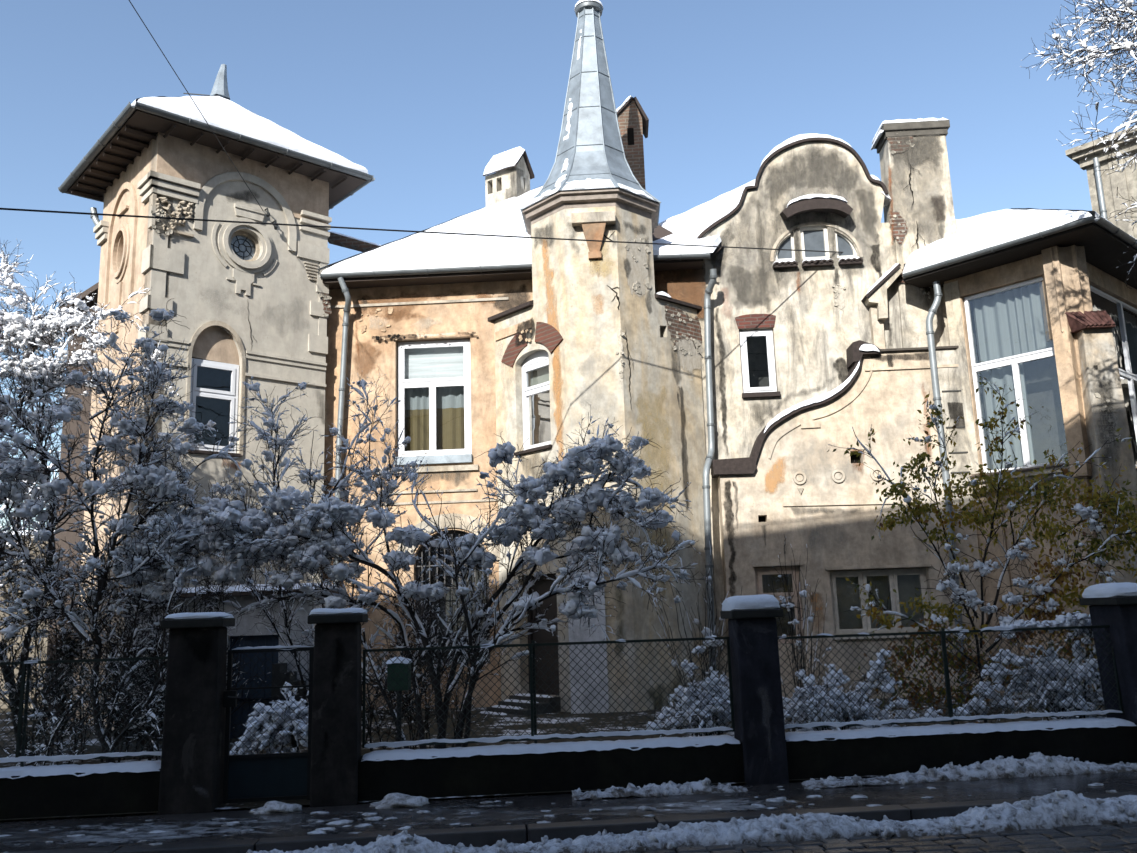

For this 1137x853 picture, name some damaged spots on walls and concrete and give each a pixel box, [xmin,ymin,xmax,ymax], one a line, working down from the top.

spalling [888,211,908,244]
crack [903,153,926,250]
spalling [624,236,652,313]
crack [607,285,634,409]
spalling [665,304,704,374]
water stain [637,350,688,509]
peeling [765,459,784,493]